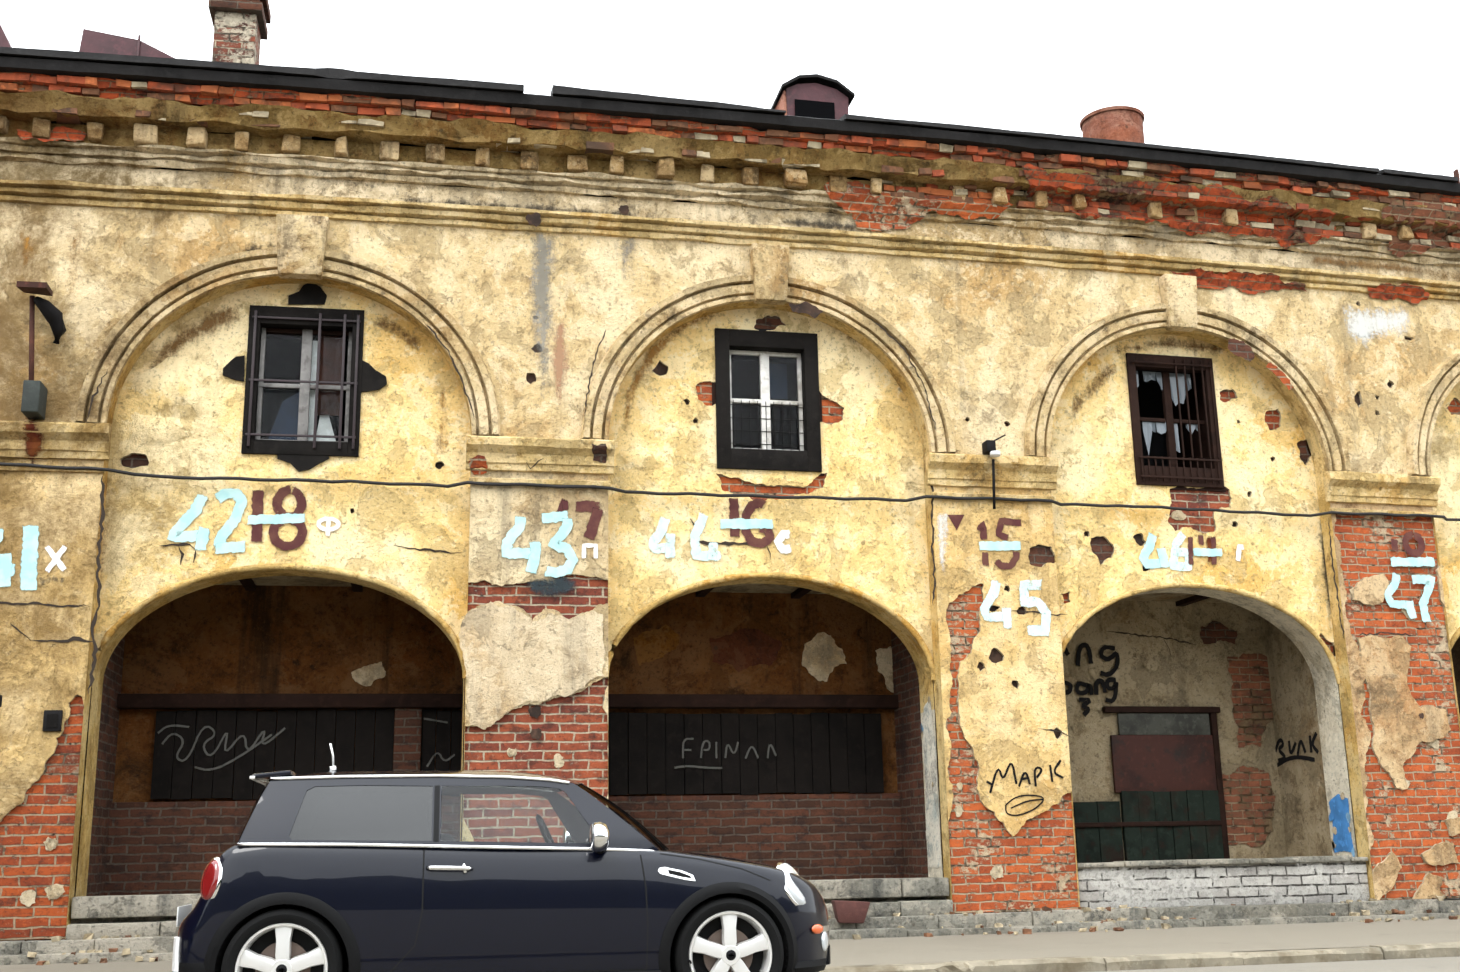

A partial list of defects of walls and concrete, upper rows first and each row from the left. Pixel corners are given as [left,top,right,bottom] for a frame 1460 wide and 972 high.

crack [0,476,105,694]
flaking render [468,574,608,620]
flaking render [684,381,712,423]
flaking render [716,473,827,501]
flaking render [820,392,844,425]
flaking render [1168,487,1252,534]
flaking render [0,694,84,940]
flaking render [463,677,608,843]
flaking render [921,583,1079,913]
flaking render [1200,621,1275,847]
flaking render [1329,514,1460,900]